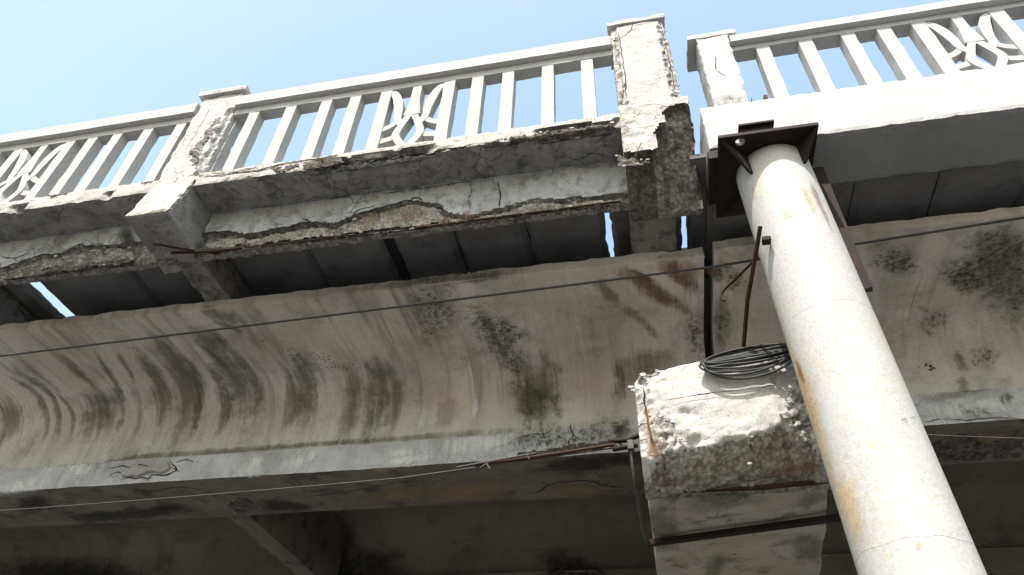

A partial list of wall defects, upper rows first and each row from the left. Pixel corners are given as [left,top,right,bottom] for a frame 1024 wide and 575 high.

spalling [187,116,344,177]
crack [186,106,501,245]
spalling [615,155,650,167]
spalling [153,200,621,254]
spalling [0,247,134,279]
rust [627,270,677,307]
rust [664,262,698,288]
water stain [944,226,1024,320]
water stain [472,306,557,418]
spalling [628,369,660,393]
spalling [650,375,829,494]